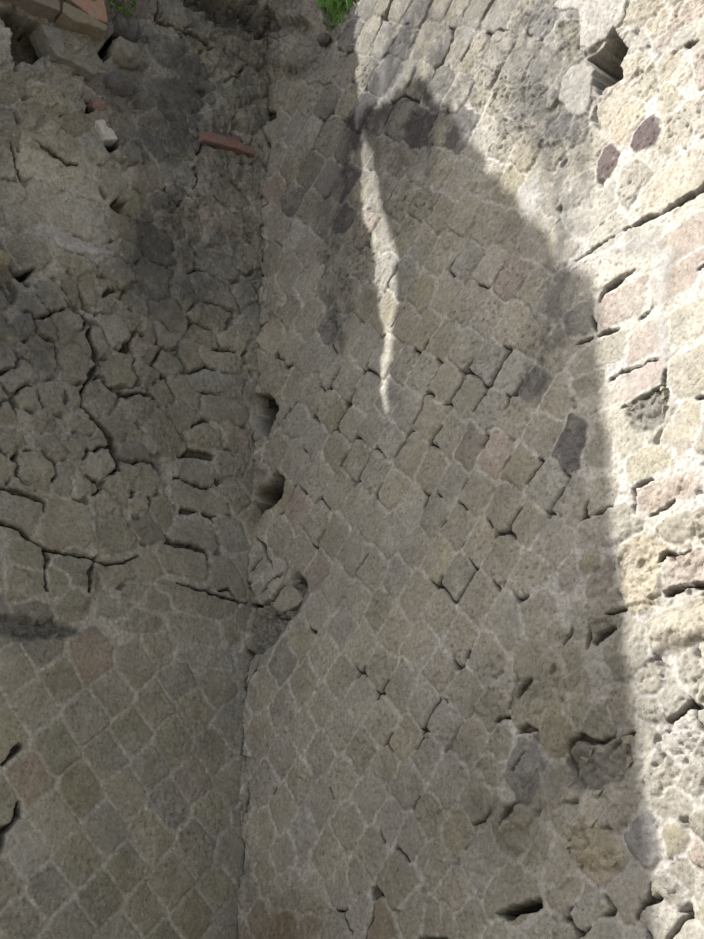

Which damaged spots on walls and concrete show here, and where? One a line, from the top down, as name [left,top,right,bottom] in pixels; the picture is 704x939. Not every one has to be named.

spalling [1,18,39,66]
flaking render [84,107,117,153]
crack [637,190,704,227]
crack [604,275,630,296]
crack [581,321,619,345]
crack [33,311,164,496]
crack [172,421,219,490]
crack [0,451,44,509]
crack [0,522,137,593]
crack [164,539,207,560]
crack [660,553,686,563]
crack [670,586,704,597]